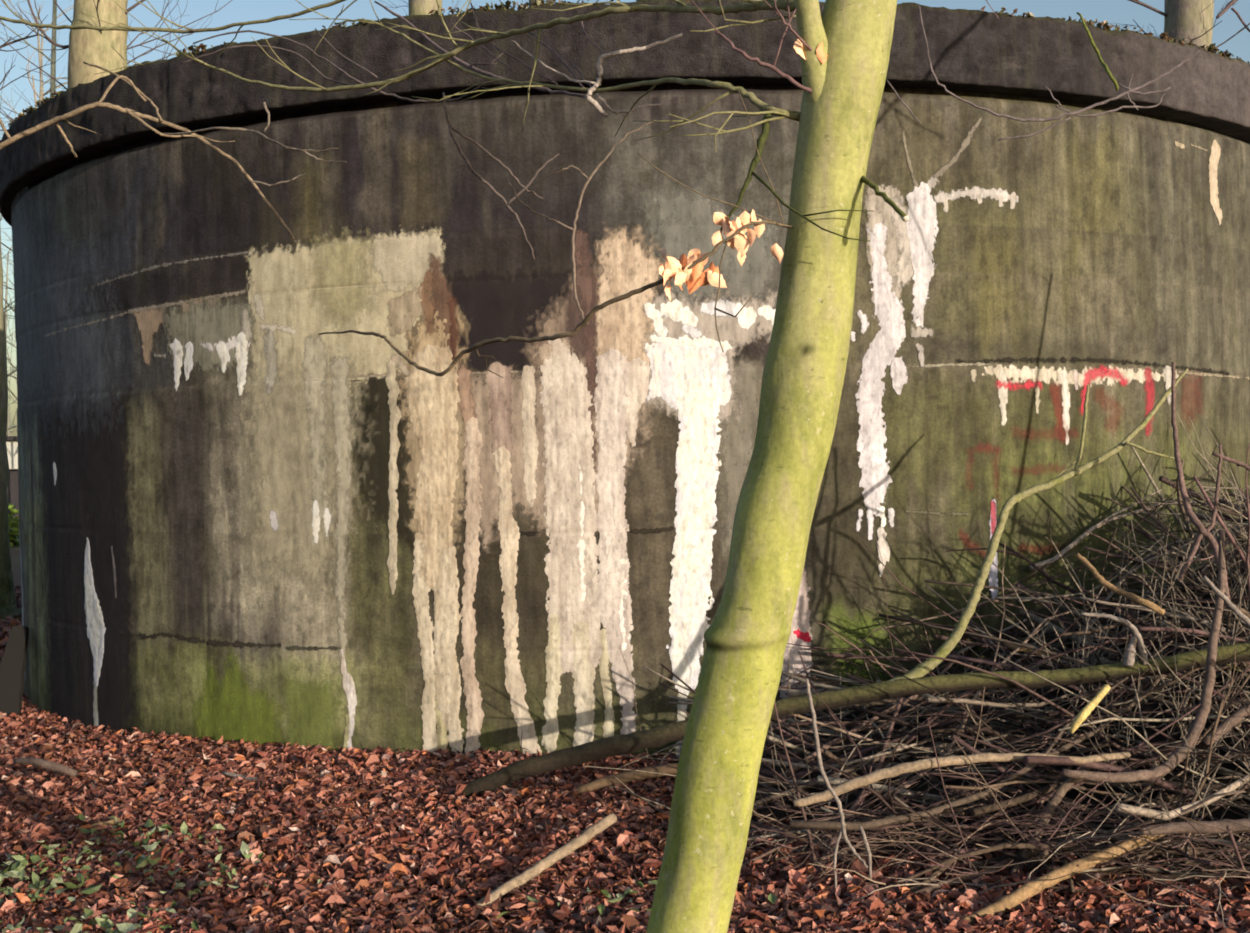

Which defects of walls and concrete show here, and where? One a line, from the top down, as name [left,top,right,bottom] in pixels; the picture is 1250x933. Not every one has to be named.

damp [11,190,423,752]
peeling [238,229,445,599]
rust [419,254,458,360]
damp [623,188,778,551]
damp [989,499,998,599]
damp [970,364,1179,445]